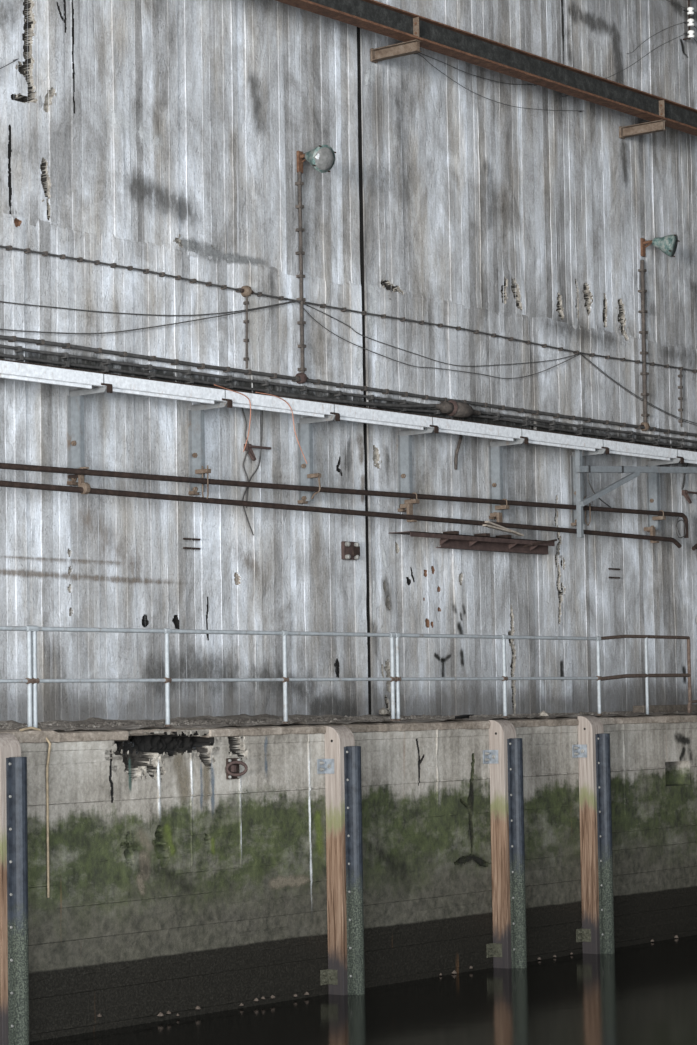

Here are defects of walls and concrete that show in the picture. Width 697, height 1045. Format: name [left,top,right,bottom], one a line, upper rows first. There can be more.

spalling [40,157,51,221]
spalling [501,277,522,310]
spalling [556,279,629,341]
spalling [110,731,248,782]
leakage [269,761,323,889]
crack [454,753,489,867]